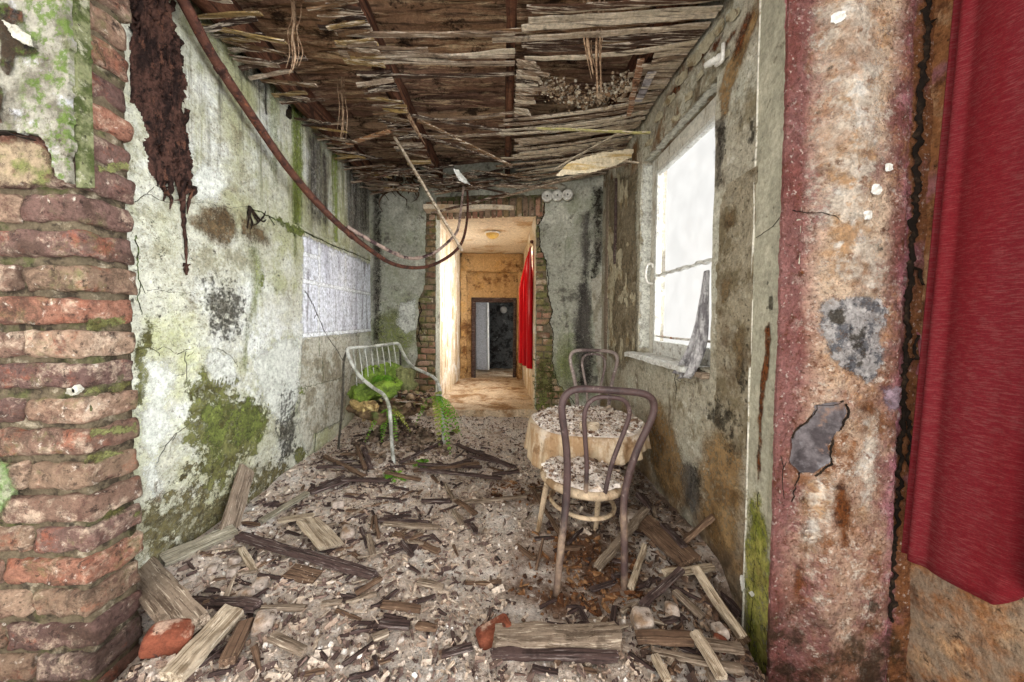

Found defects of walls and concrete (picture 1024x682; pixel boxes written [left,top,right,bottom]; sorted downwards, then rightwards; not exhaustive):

peeling [0,0,95,188]
peeling [654,7,740,123]
leakage [189,164,268,246]
peeling [65,384,84,396]
leakage [139,361,175,503]
leakage [195,275,265,385]
leakage [256,338,299,465]
flaking render [405,194,572,410]
leakage [574,187,603,395]
rust [757,322,771,479]
flaking render [790,400,853,477]
crack [888,0,937,623]